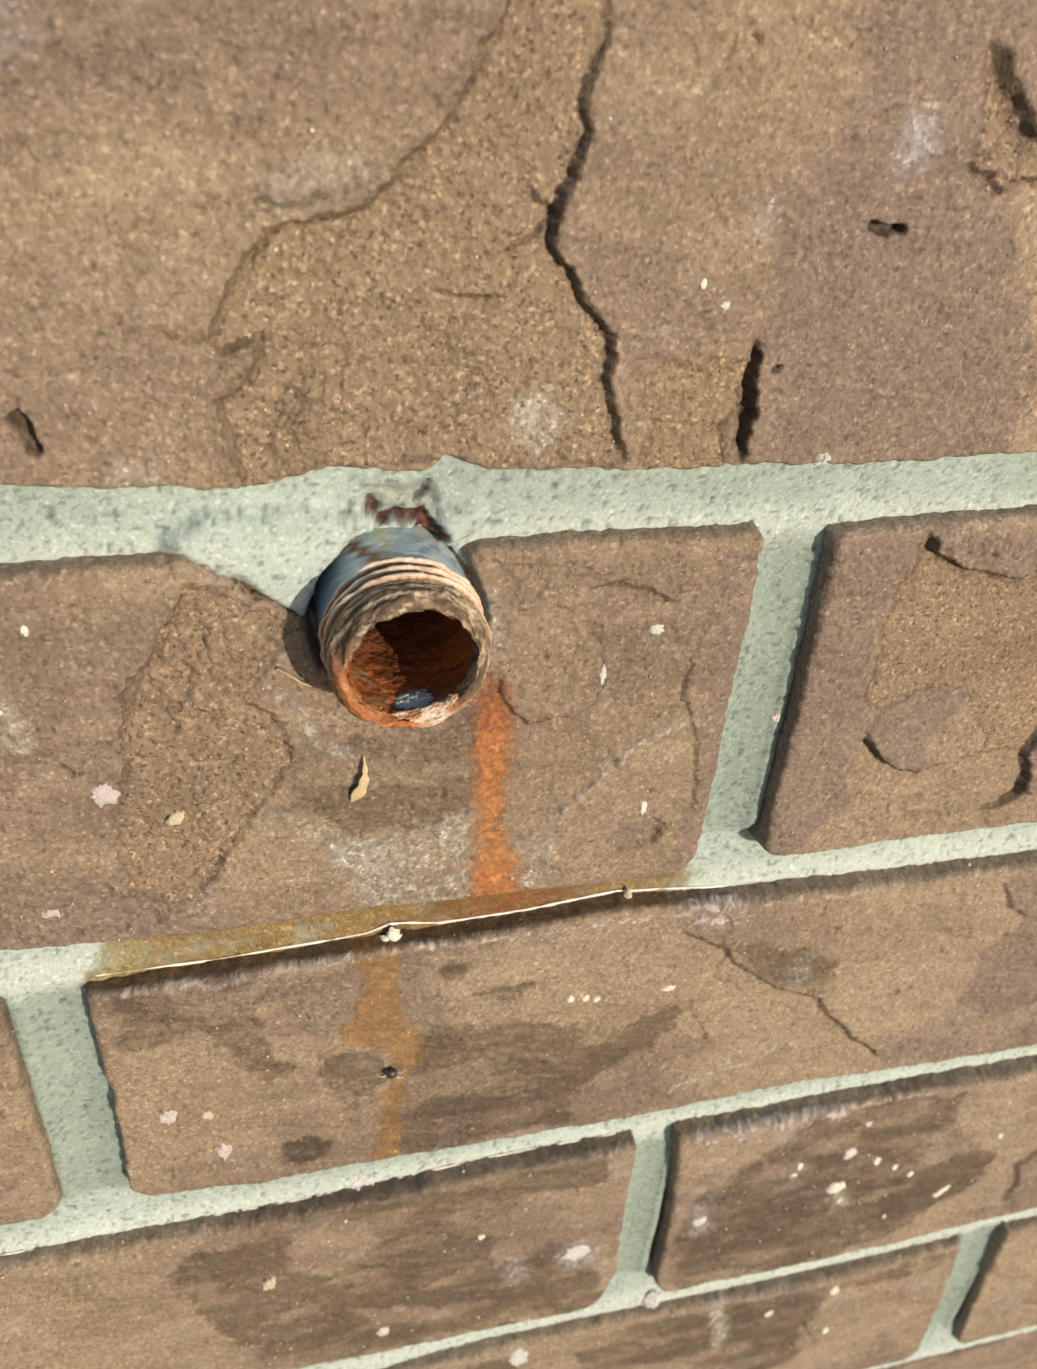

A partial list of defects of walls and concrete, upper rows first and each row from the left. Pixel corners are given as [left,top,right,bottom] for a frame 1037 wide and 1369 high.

crack [989,41,1037,144]
crack [208,0,511,487]
crack [506,24,630,461]
crack [718,338,762,467]
spalling [865,545,1037,753]
rust [86,689,700,1162]
damp [97,778,1004,1080]
crack [682,931,880,1056]
damp [175,1007,678,1357]
damp [676,1075,1029,1289]
damp [442,1352,516,1369]
damp [534,1251,959,1369]